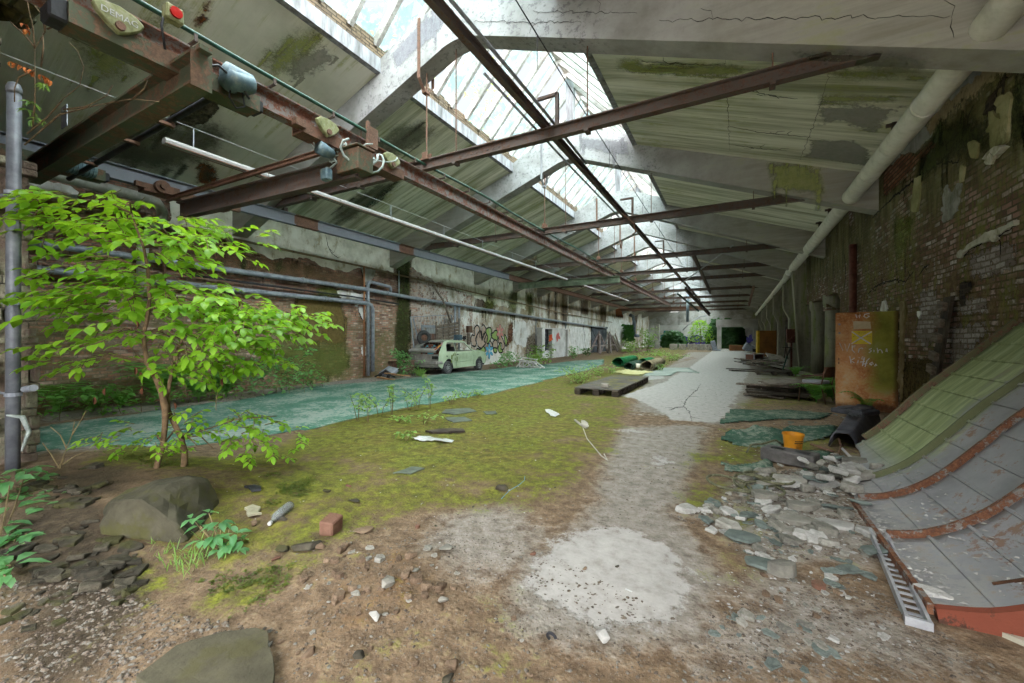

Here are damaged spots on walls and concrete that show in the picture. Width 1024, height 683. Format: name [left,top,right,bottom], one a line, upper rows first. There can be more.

rust [194,1,211,28]
crack [660,0,955,37]
damp [288,49,339,88]
crack [643,58,830,160]
flaking render [983,73,1014,165]
rust [162,142,268,184]
spalling [883,126,935,197]
rust [306,192,566,281]
flaking render [956,220,1020,258]
flaking render [411,257,537,359]